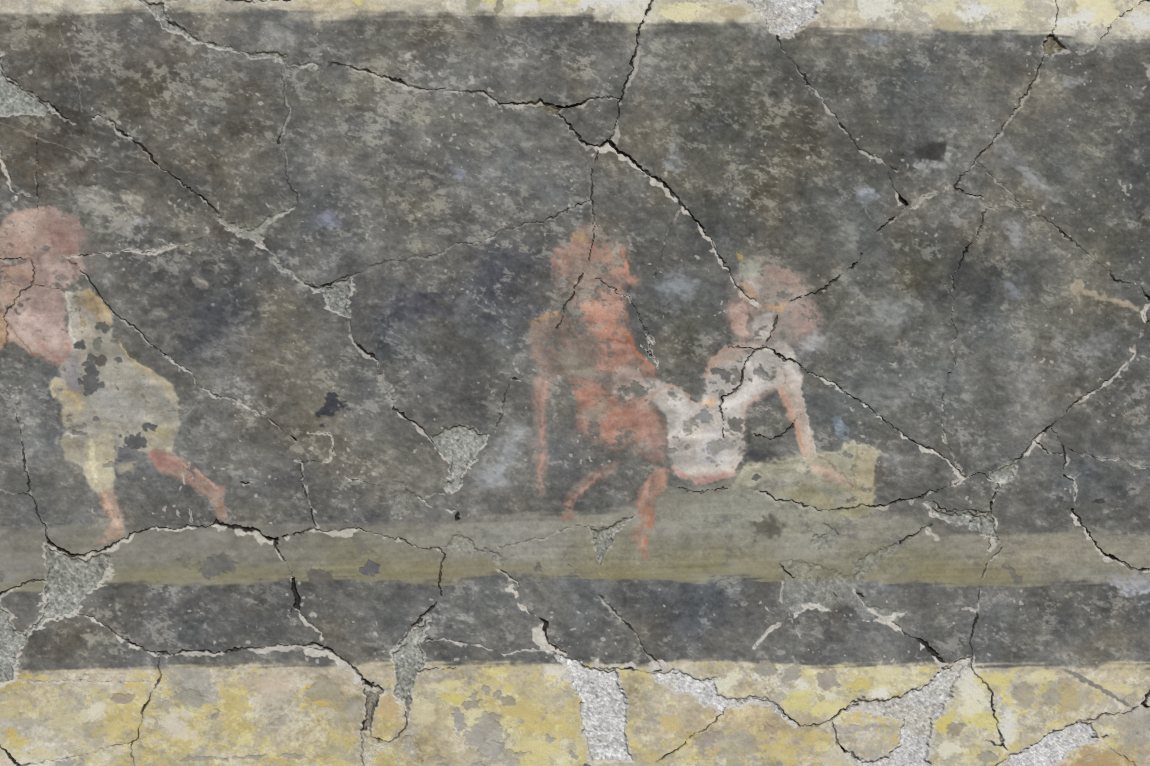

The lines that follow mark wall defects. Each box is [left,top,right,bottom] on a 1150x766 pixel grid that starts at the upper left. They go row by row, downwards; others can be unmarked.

crack [130,0,296,35]
spalling [717,0,824,40]
spalling [0,52,56,118]
crack [0,76,667,766]
spalling [430,425,490,495]
crack [273,0,1150,766]
spalling [0,541,116,689]
spalling [555,655,635,766]
spalling [832,654,977,766]